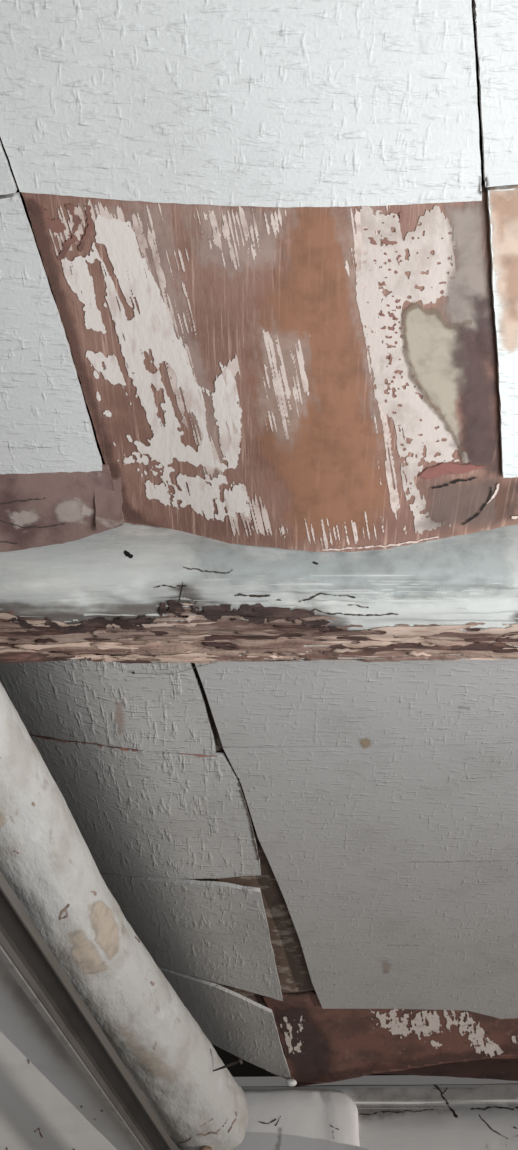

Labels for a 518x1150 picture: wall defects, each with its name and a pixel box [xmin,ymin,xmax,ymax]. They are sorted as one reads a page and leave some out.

peeling [38,204,251,522]
rust [258,215,383,532]
peeling [356,205,484,535]
leakage [402,178,518,523]
peeling [371,1009,518,1057]